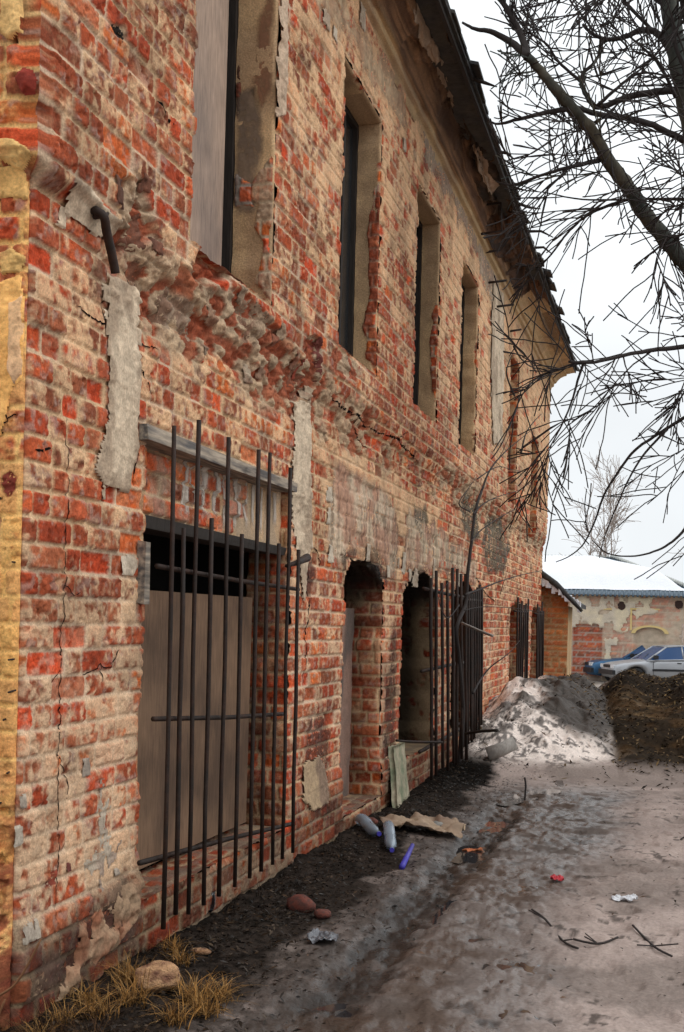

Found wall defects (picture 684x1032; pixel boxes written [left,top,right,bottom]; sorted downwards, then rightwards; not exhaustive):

leakage [237,88,262,211]
peeling [55,173,164,255]
peeling [317,0,542,446]
crack [331,396,417,461]